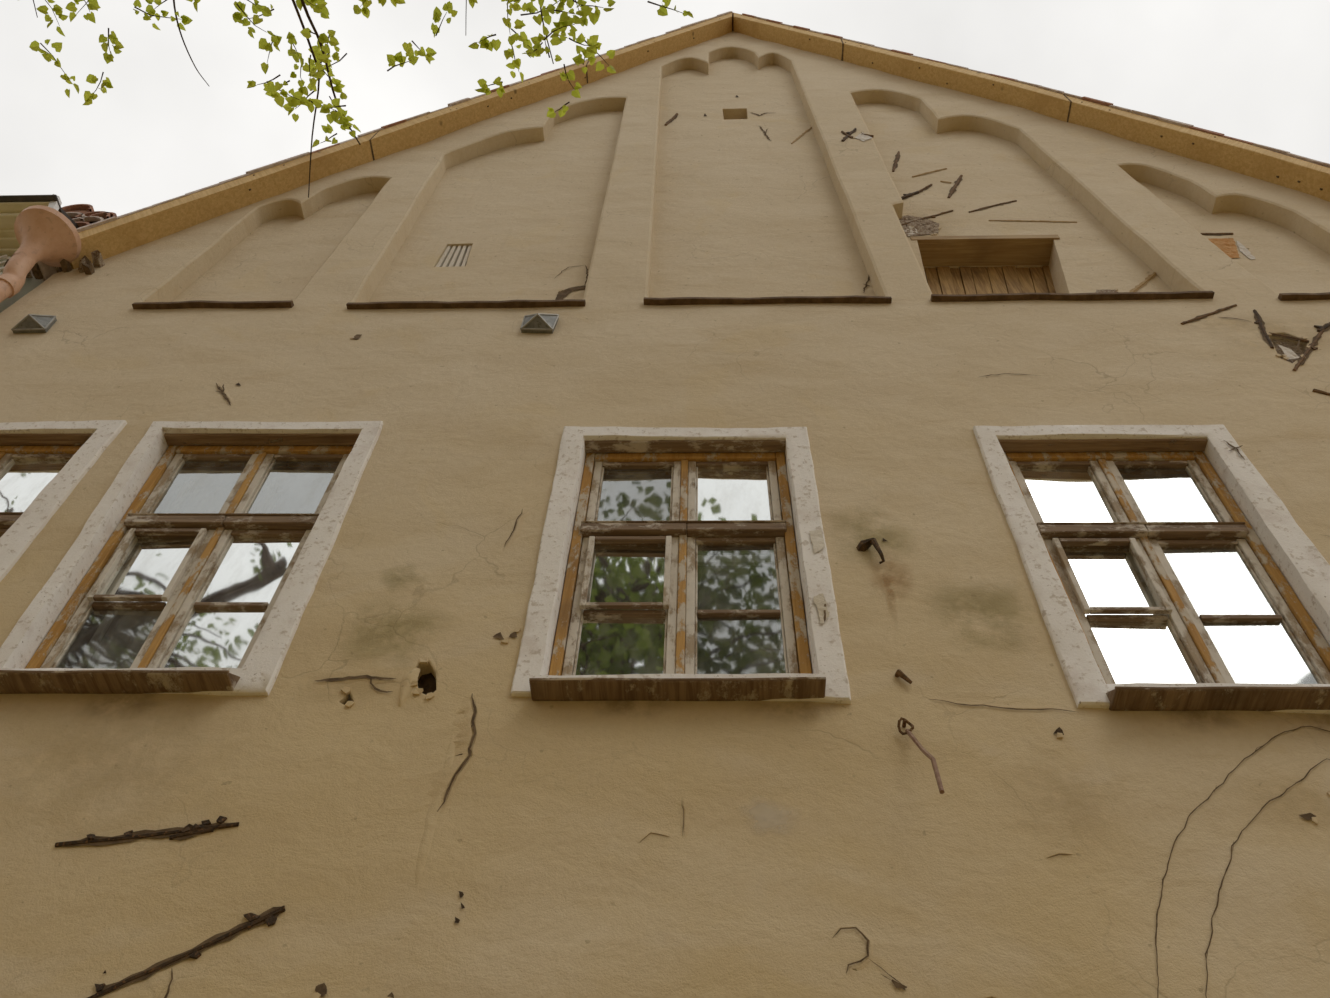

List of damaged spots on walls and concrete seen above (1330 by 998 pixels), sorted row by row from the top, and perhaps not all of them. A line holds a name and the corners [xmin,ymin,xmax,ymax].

spalling [1266,332,1310,363]
spalling [411,657,436,700]
crack [426,693,481,814]
crack [1155,726,1330,998]